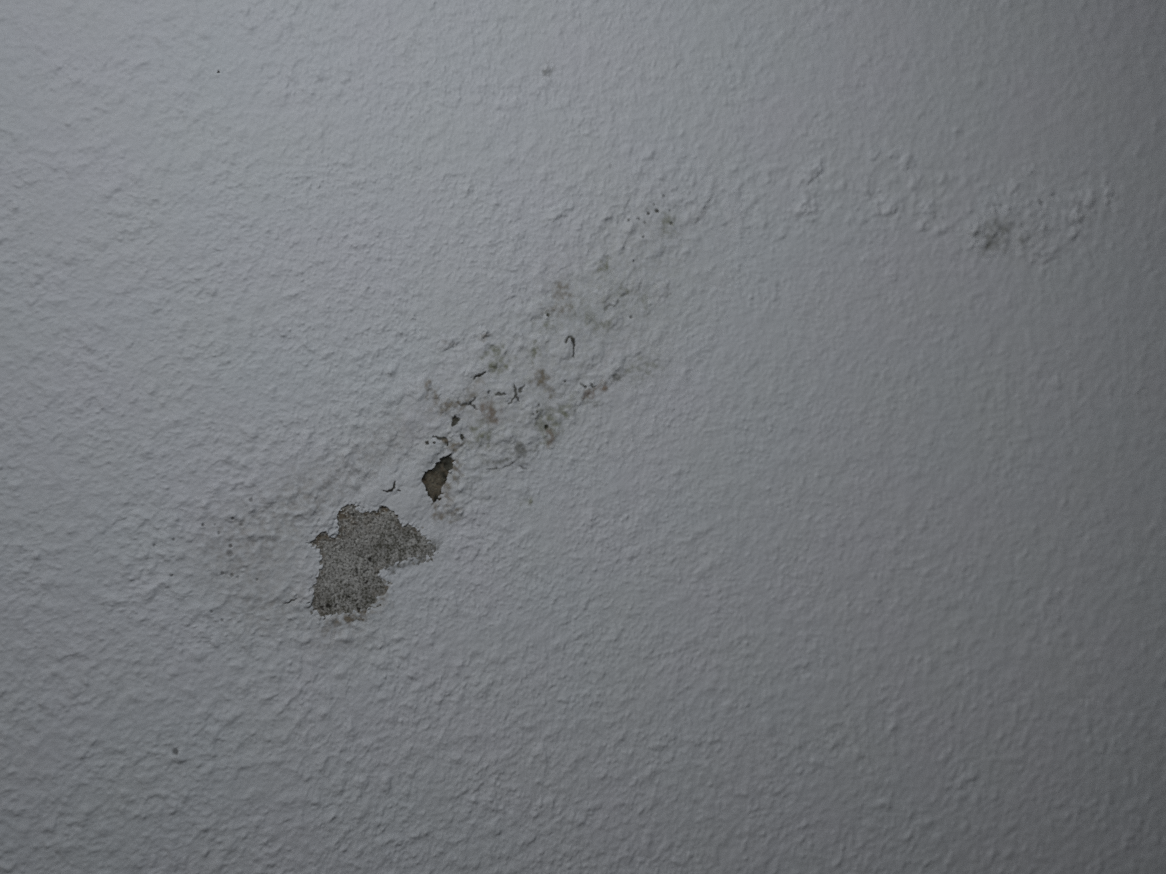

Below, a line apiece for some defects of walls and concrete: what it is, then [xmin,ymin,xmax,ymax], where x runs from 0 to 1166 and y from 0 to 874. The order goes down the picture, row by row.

peeling [421,454,455,503]
peeling [310,504,438,622]